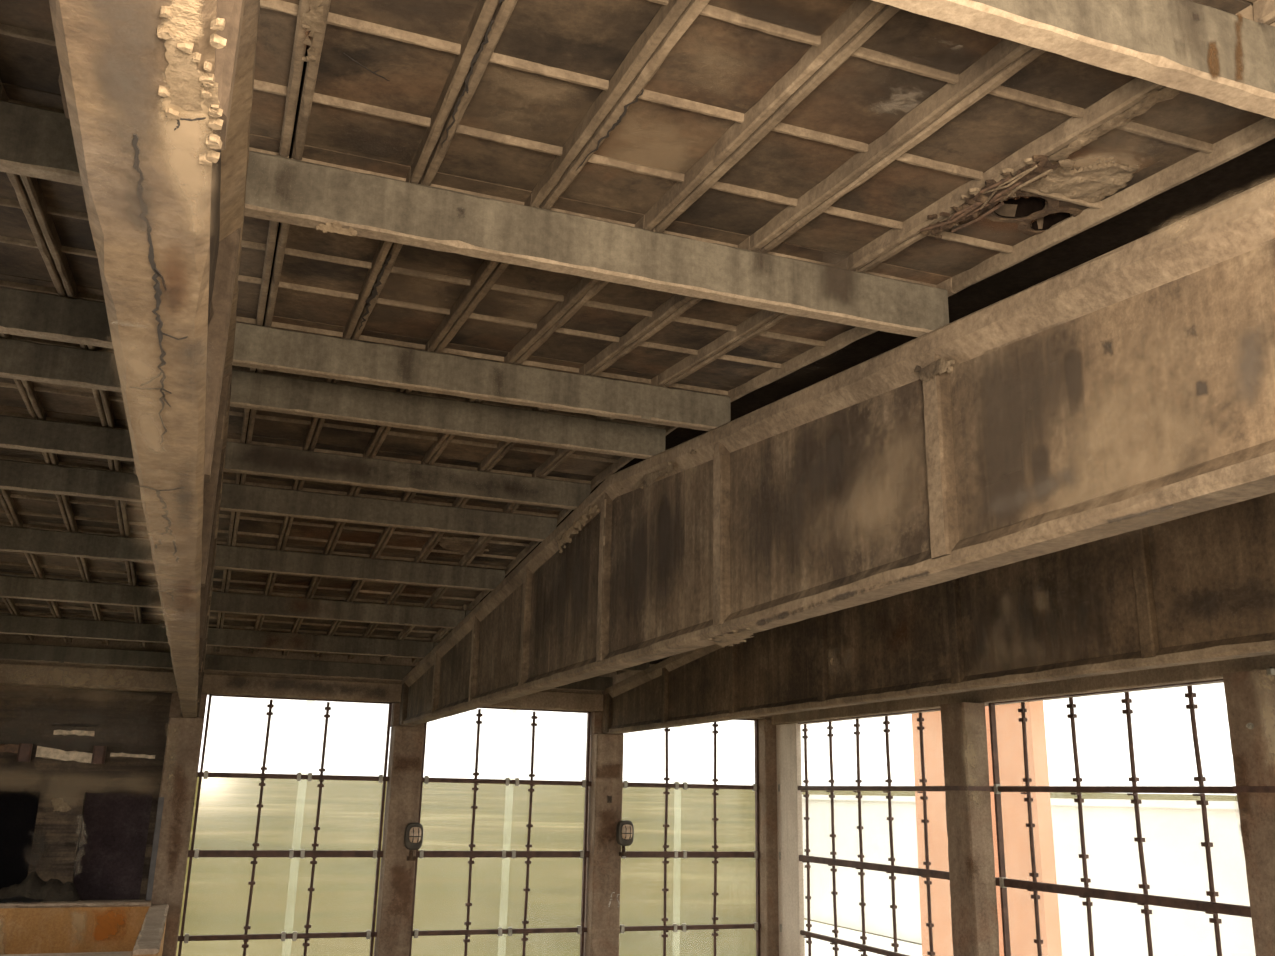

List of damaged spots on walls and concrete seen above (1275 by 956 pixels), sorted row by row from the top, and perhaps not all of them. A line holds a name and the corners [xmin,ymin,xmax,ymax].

crack [166,116,206,131]
peeling [157,6,227,165]
spalling [920,87,1180,239]
crack [129,134,188,451]